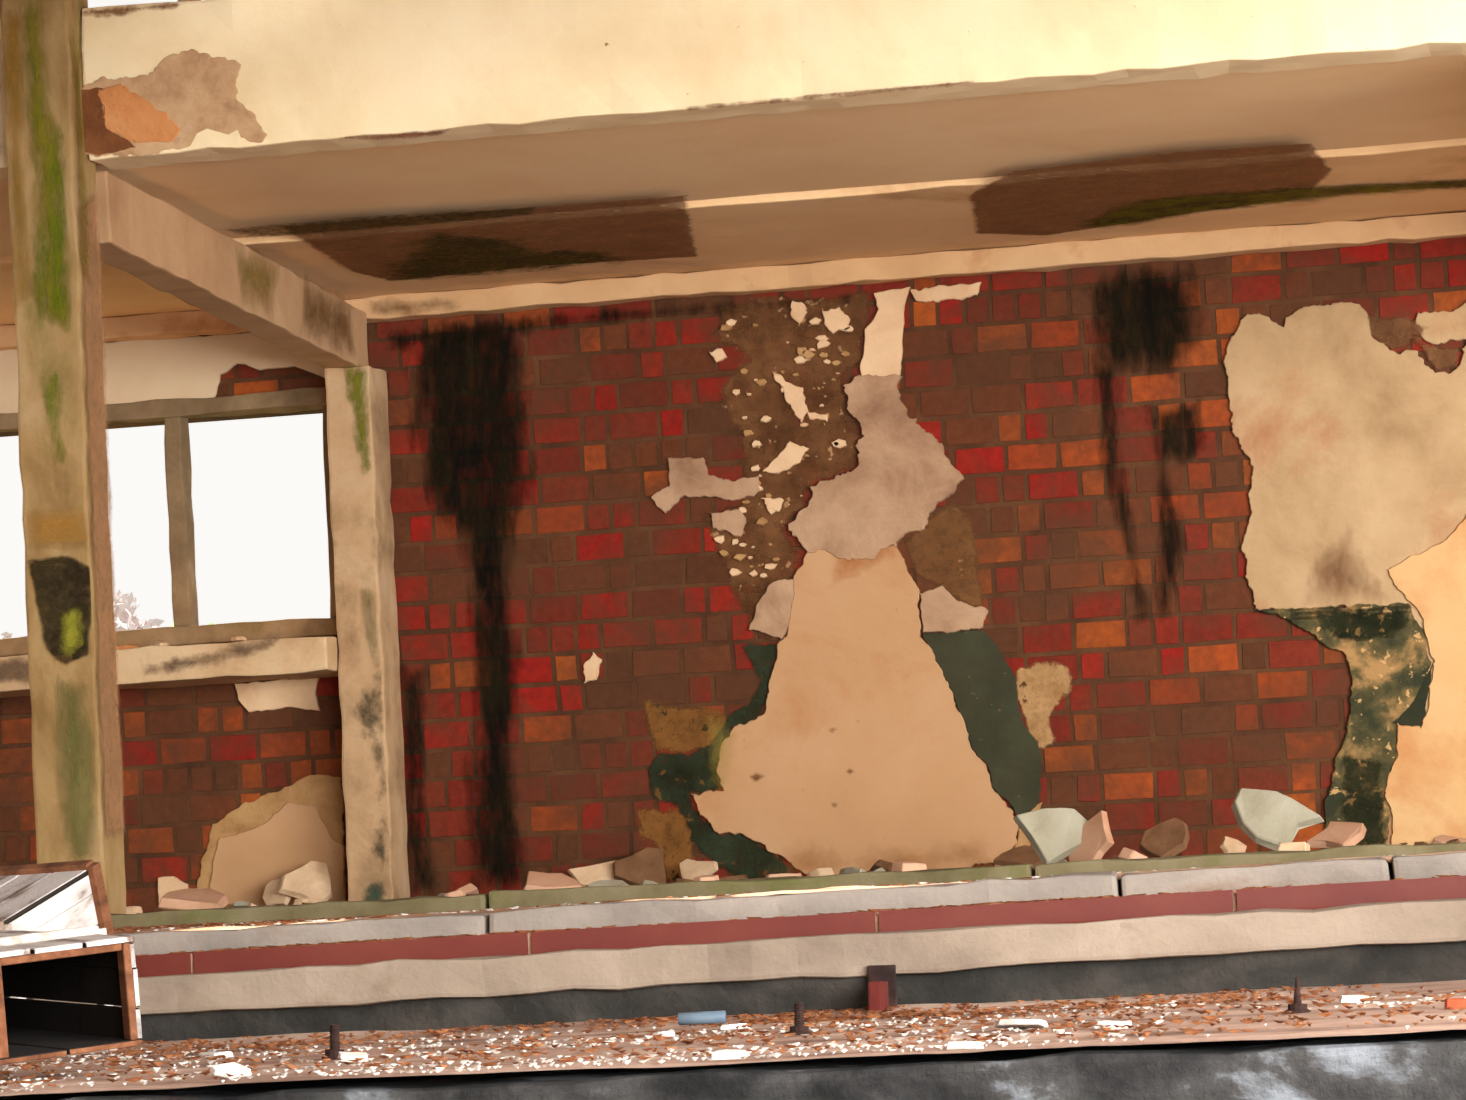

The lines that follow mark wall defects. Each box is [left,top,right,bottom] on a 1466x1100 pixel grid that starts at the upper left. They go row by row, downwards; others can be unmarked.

spalling [81,49,267,157]
leakage [1095,271,1190,551]
leakage [1154,406,1200,458]
leakage [394,317,567,889]
peeling [583,652,602,684]
peeling [636,282,1071,882]
leakage [1136,476,1180,610]
peeling [1223,302,1466,845]
peeling [158,774,348,908]
peeling [366,884,383,900]